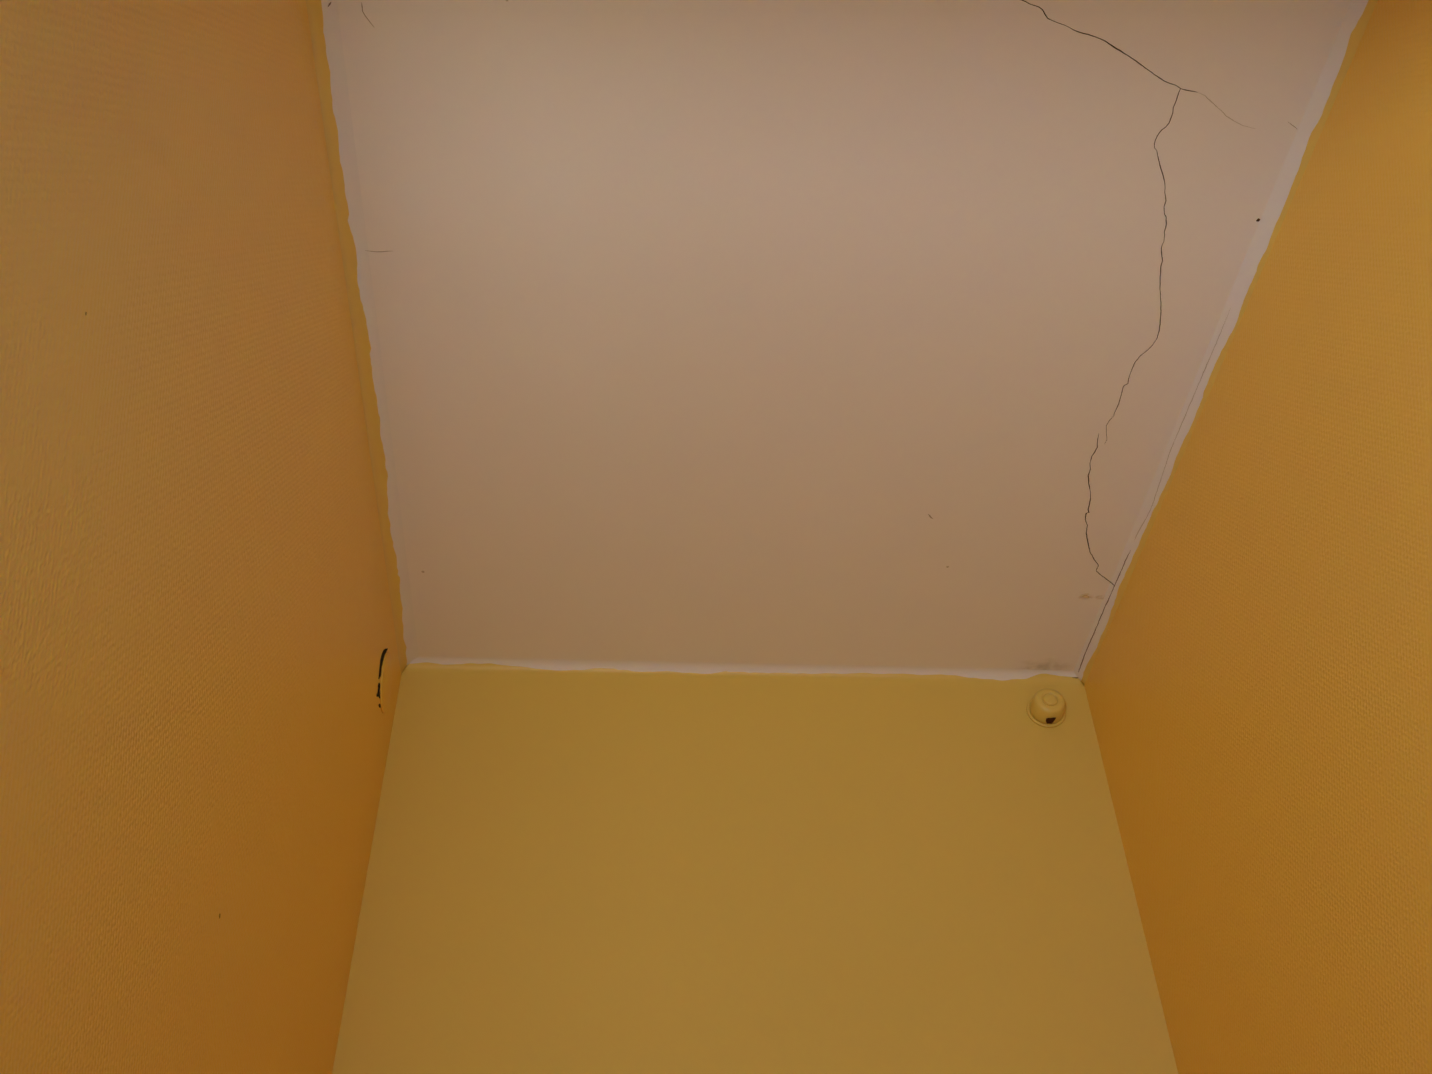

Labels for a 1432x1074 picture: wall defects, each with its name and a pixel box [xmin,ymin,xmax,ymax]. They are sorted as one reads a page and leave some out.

crack [1022,0,1255,678]